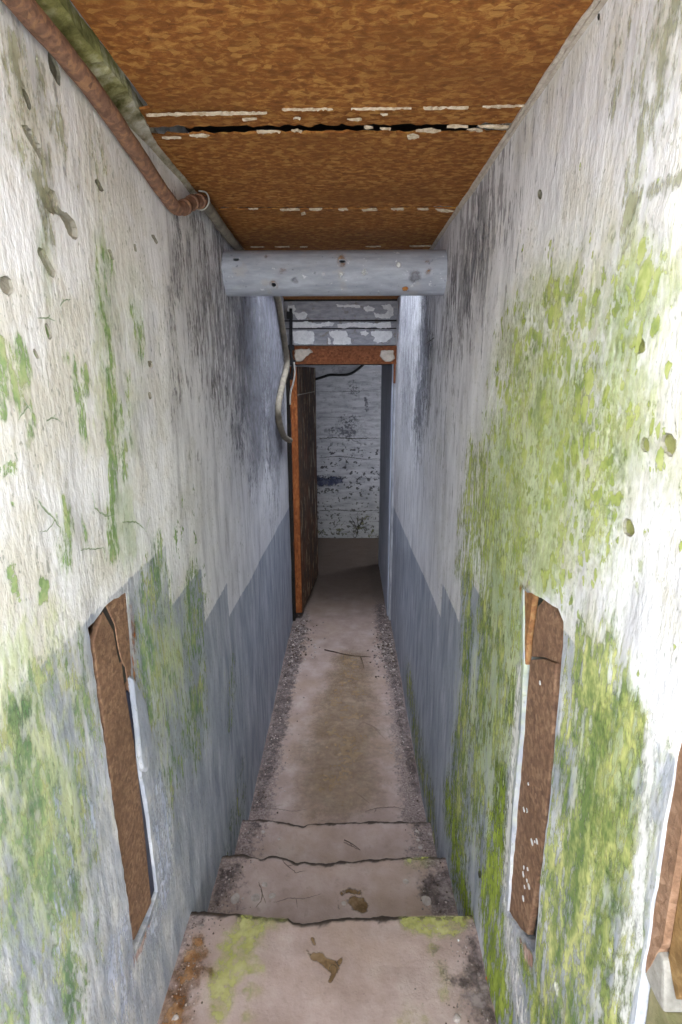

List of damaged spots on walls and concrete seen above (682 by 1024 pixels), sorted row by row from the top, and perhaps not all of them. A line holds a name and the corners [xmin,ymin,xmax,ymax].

peeling [146,107,333,135]
peeling [347,106,469,130]
peeling [407,124,509,140]
peeling [280,208,322,216]
peeling [287,304,394,345]
water stain [0,335,9,421]
water stain [67,356,89,443]
water stain [95,246,133,564]
water stain [566,363,623,556]
water stain [406,437,547,1024]
water stain [0,531,208,1024]
water stain [609,685,658,1024]